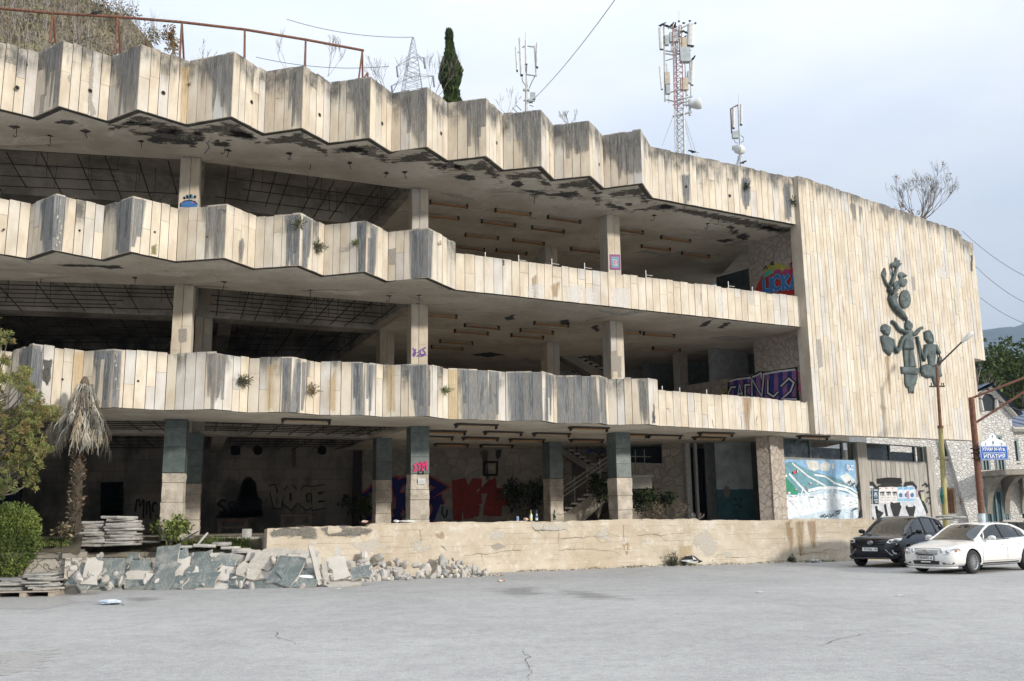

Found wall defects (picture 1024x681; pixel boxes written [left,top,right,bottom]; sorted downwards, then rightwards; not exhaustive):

water stain [42,42,63,107]
water stain [116,45,141,115]
water stain [205,53,234,116]
water stain [742,178,750,209]
water stain [40,195,69,252]
water stain [115,197,146,254]
water stain [203,205,226,258]
water stain [285,214,311,268]
water stain [358,222,377,275]
water stain [408,365,433,416]
water stain [448,359,607,424]
water stain [639,379,649,423]